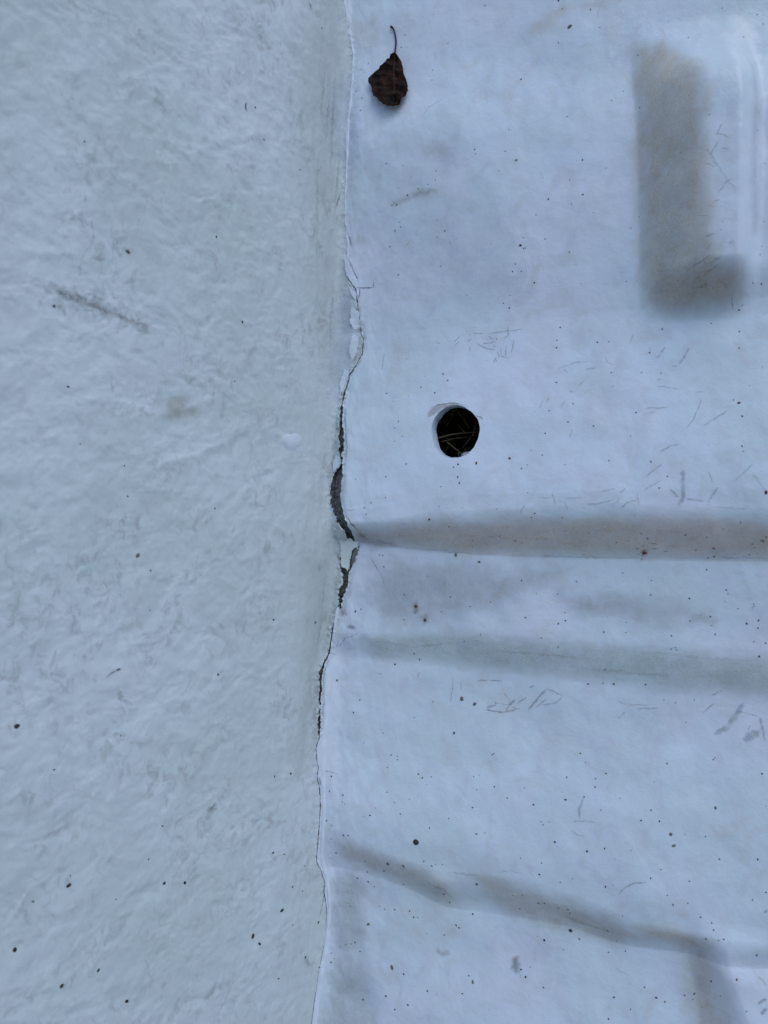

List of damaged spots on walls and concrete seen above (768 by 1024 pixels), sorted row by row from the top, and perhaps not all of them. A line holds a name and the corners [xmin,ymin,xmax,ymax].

crack [316,234,383,916]